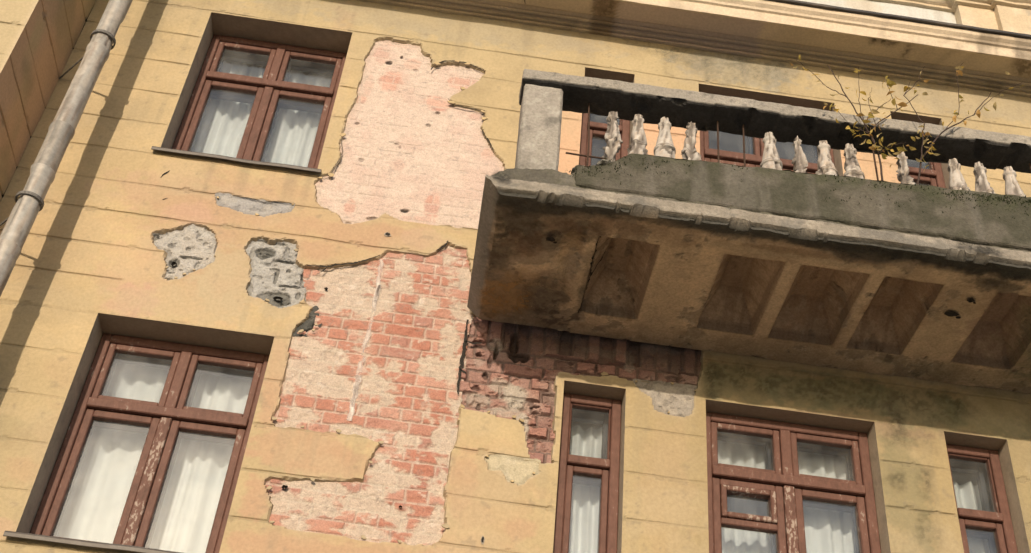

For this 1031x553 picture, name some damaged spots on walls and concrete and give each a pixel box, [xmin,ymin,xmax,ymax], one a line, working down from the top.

flaking render [315,40,510,229]
spalling [566,103,607,166]
peeling [215,193,295,217]
flaking render [153,224,217,281]
crack [577,236,605,313]
flaking render [245,239,701,546]